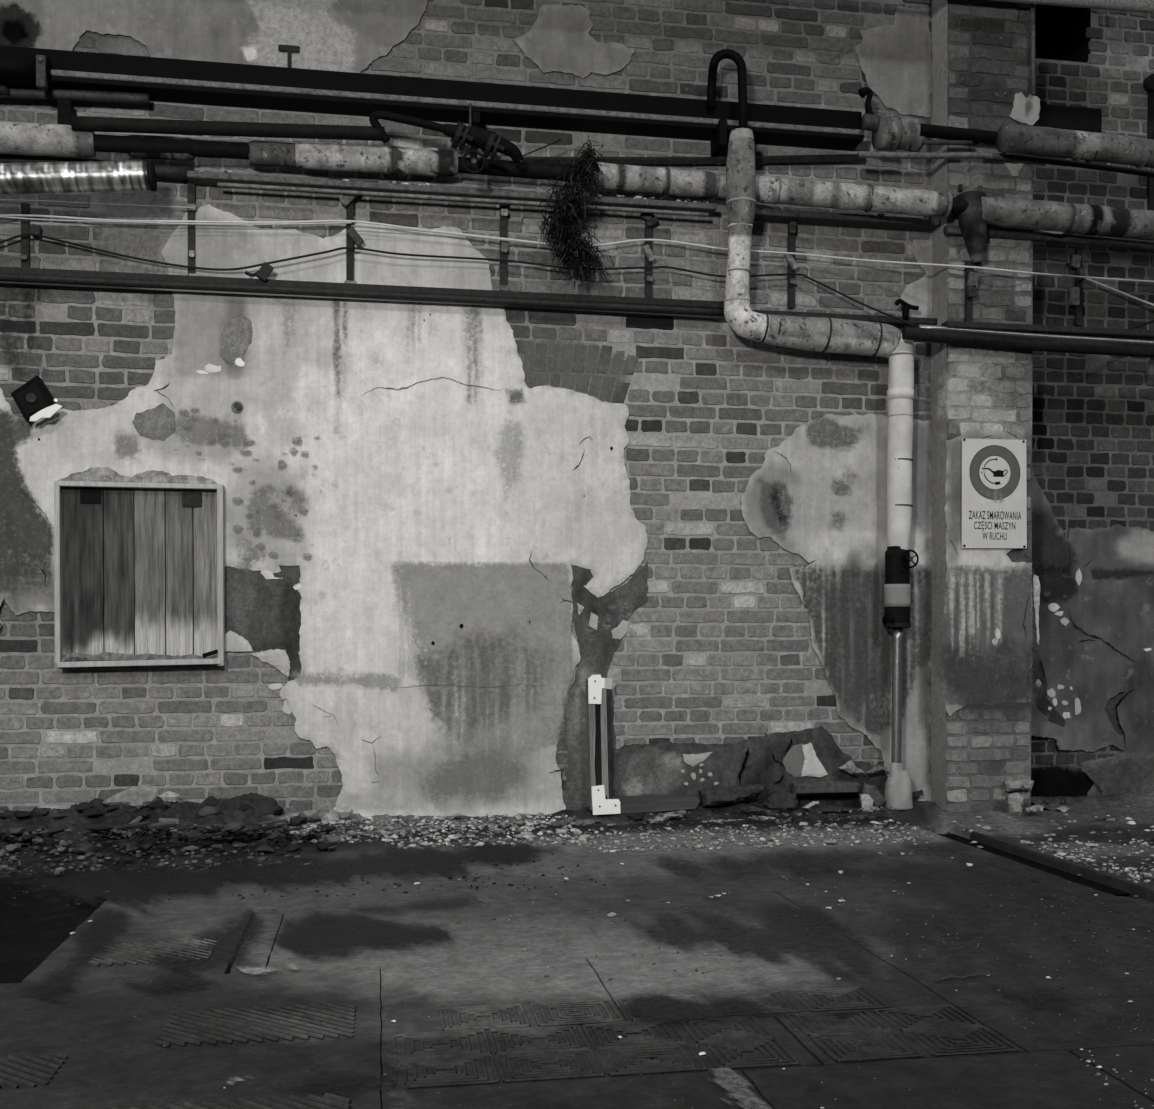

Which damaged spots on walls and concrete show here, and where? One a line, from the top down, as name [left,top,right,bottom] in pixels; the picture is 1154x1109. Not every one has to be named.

peeling [0,0,263,65]
peeling [325,0,428,73]
peeling [161,204,492,290]
crack [364,377,503,394]
leakage [0,410,54,586]
peeling [0,291,648,817]
peeling [741,413,1154,801]
leakage [948,570,1003,660]
leakage [293,587,543,797]